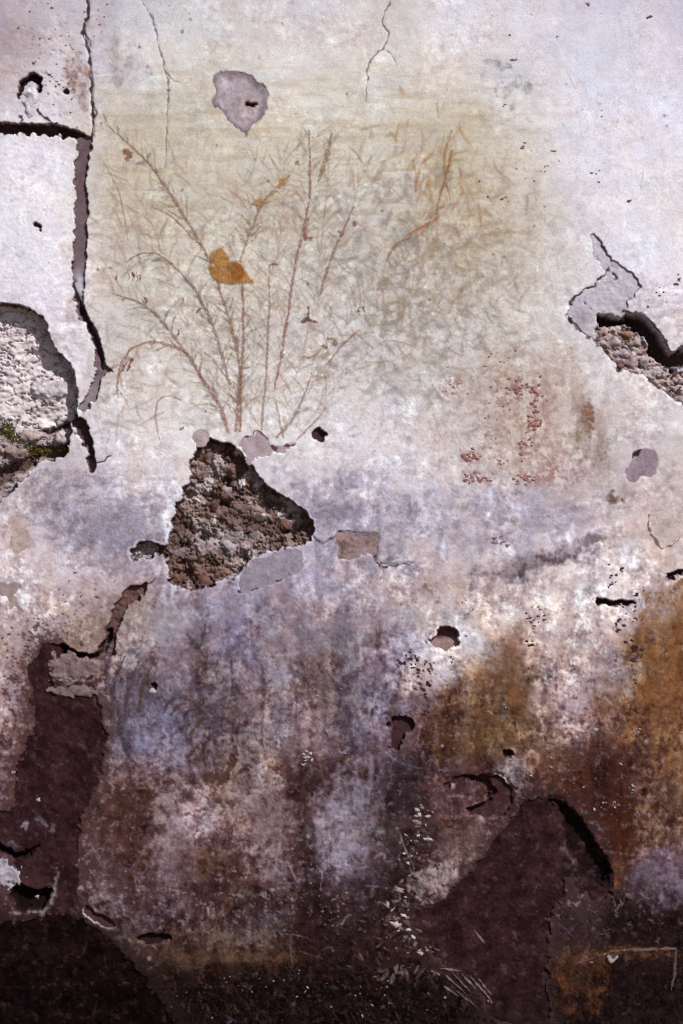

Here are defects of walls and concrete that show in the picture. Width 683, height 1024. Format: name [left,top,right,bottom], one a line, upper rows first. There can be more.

crack [143,3,171,163]
flaking render [212,72,268,135]
crack [366,2,392,96]
crack [0,0,111,472]
flaking render [566,234,683,405]
flaking render [0,305,78,501]
flaking render [132,430,314,595]
flaking render [334,530,380,560]
flaking render [624,448,658,483]
spalling [430,626,459,651]
flaking render [0,643,175,1024]
flaking render [411,774,614,1024]